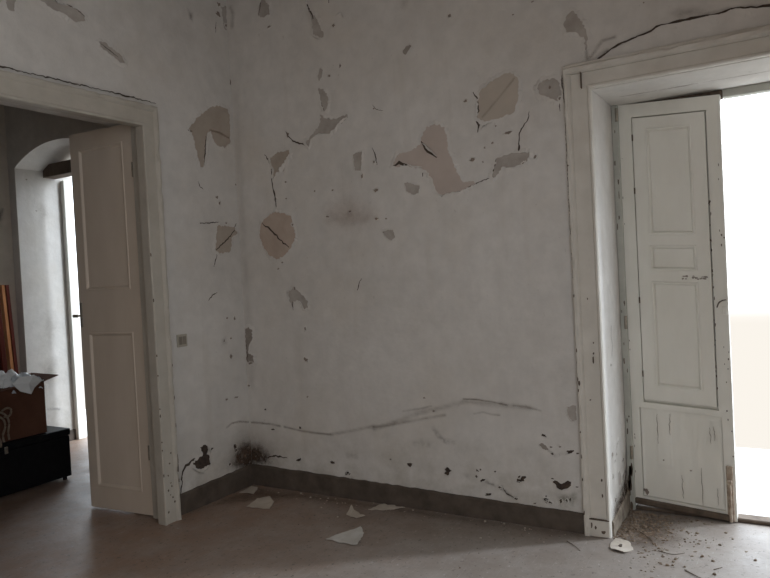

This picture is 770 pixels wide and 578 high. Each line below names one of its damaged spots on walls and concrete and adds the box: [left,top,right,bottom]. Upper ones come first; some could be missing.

peeling [3,0,89,28]
crack [597,4,770,59]
peeling [533,74,564,109]
peeling [186,101,233,171]
peeling [389,68,538,200]
peeling [257,63,351,270]
peeling [200,221,239,265]
spalling [161,441,214,514]
mould [228,443,287,467]